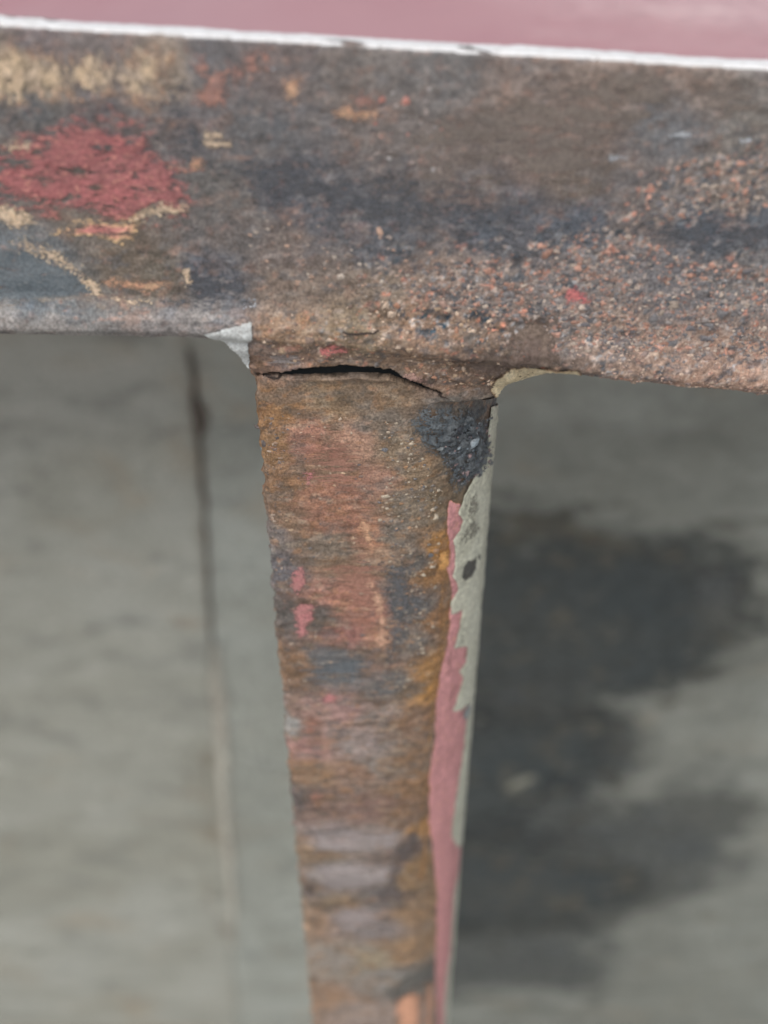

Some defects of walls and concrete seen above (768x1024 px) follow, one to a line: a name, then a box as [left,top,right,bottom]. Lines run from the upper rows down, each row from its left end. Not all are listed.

crack [255,365,448,399]
rust [408,404,493,493]
peeling [428,367,581,1024]
damp [450,506,768,1001]
rust [391,962,436,1024]